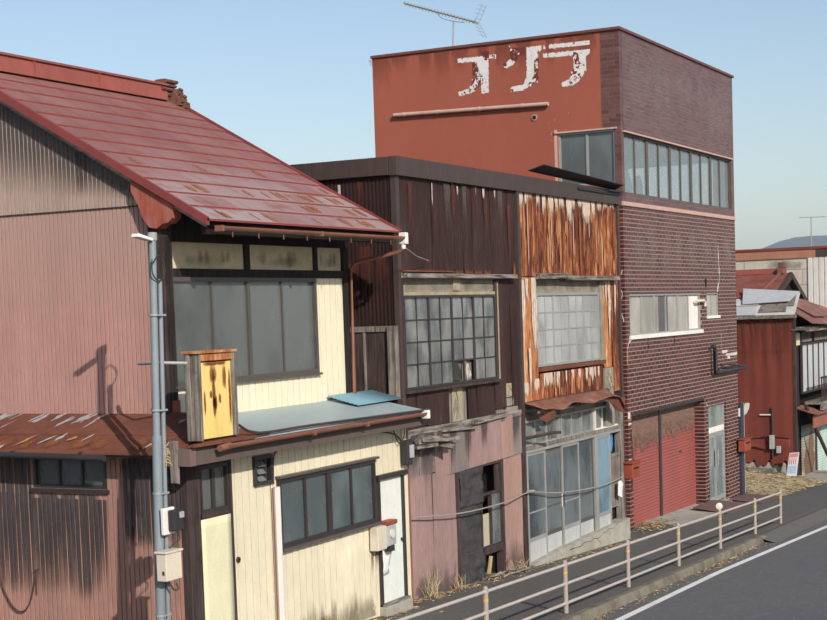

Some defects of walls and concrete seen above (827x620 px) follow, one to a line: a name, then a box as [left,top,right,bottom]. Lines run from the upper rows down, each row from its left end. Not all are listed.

peeling [464,51,495,94]
peeling [502,46,557,87]
peeling [565,52,586,87]
water stain [0,104,132,194]
corrosion [513,206,616,274]
corrosion [544,366,600,398]
water stain [411,425,471,464]
corrosion [632,402,694,452]
water stain [122,458,154,545]
water stain [167,466,181,509]
water stain [0,458,107,593]